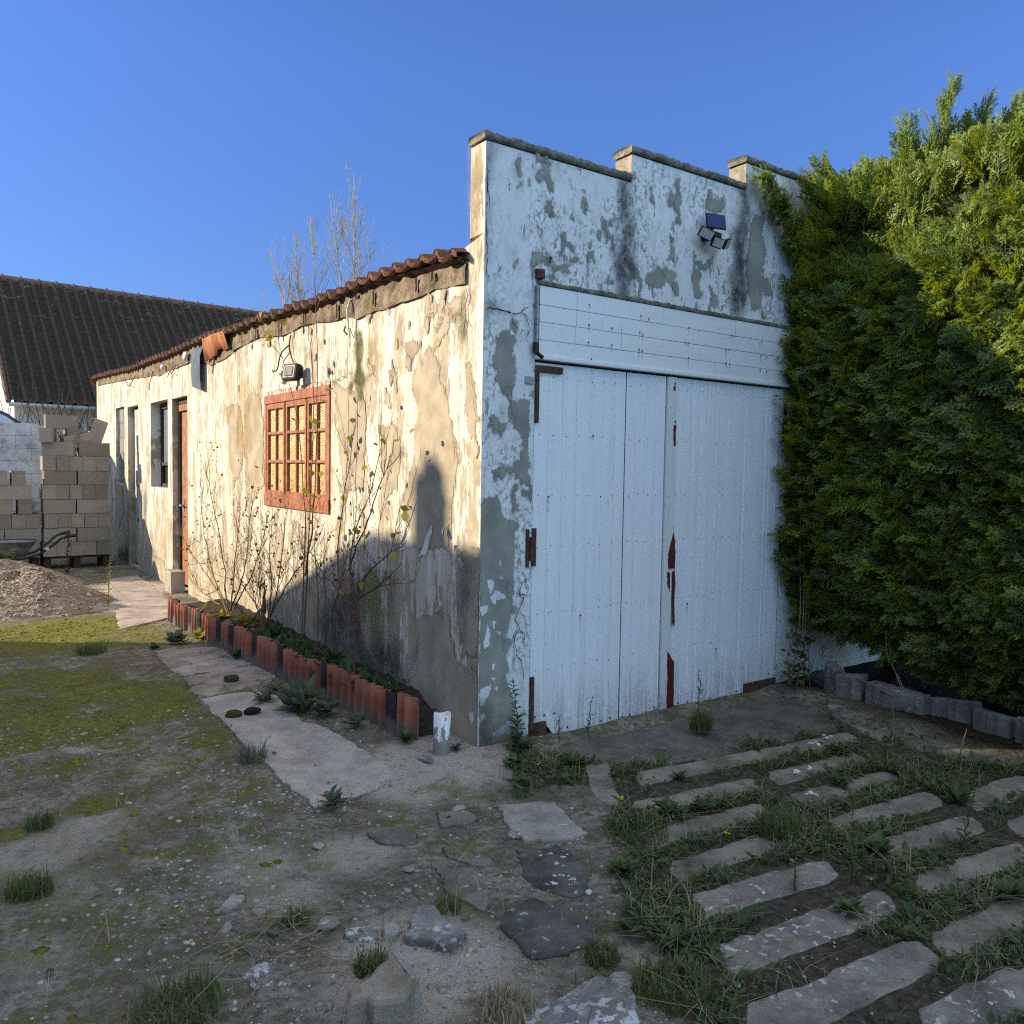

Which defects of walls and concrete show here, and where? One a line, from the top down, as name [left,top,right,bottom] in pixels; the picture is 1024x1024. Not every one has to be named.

peeling [536,153,557,221]
peeling [530,174,682,296]
damp [619,201,634,296]
peeling [690,250,724,311]
damp [732,195,749,314]
peeling [97,261,534,747]
crack [509,578,527,688]